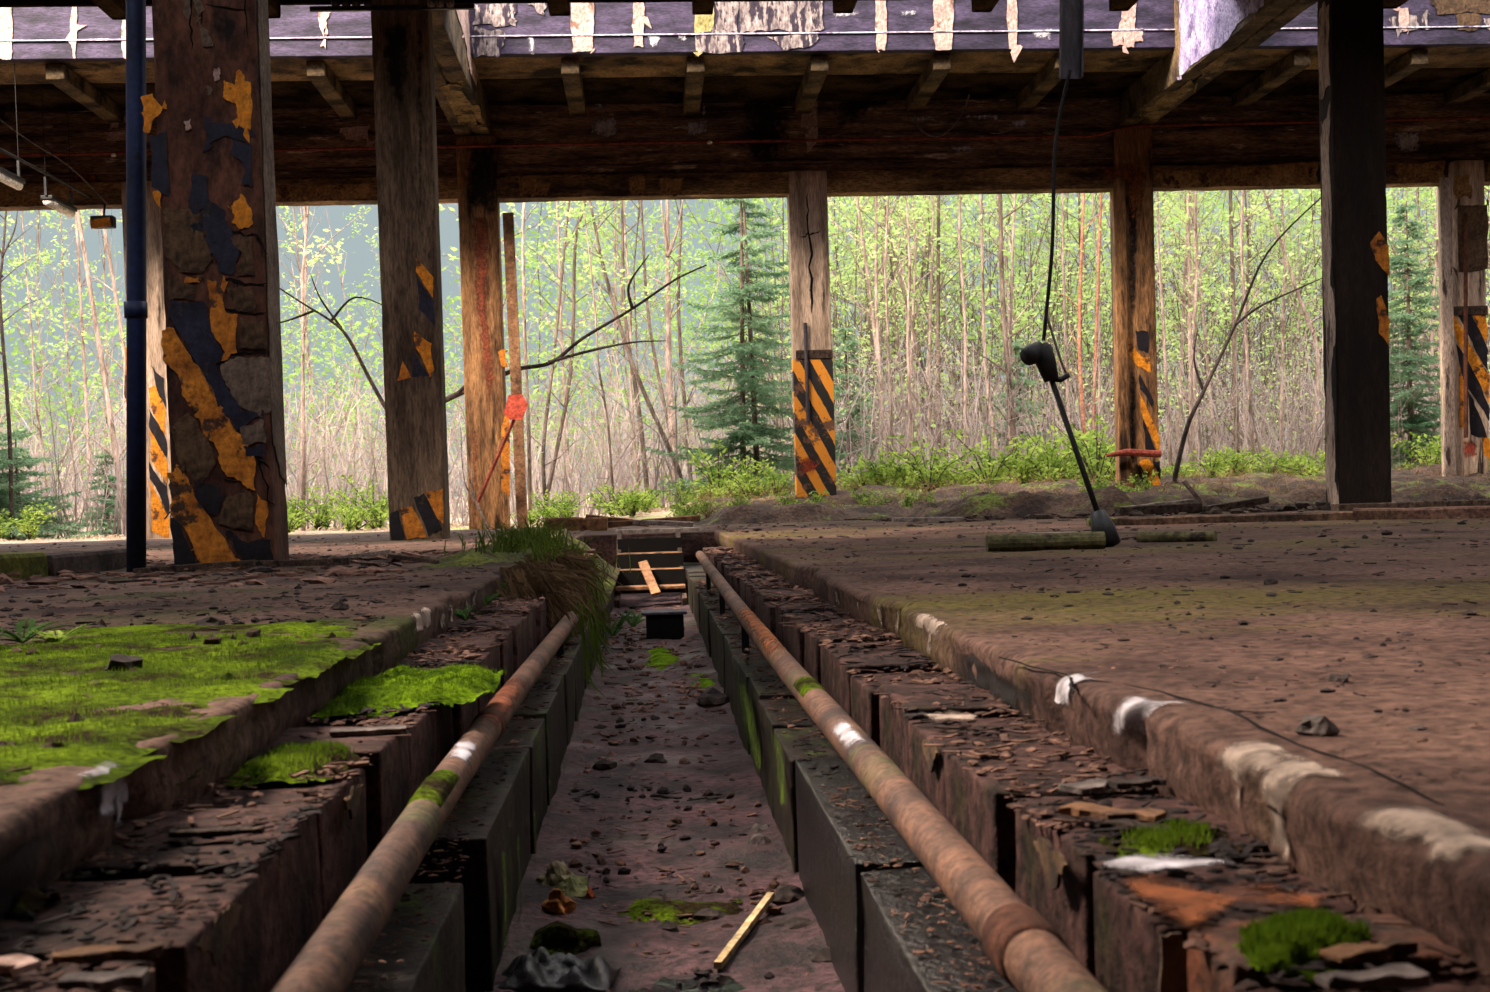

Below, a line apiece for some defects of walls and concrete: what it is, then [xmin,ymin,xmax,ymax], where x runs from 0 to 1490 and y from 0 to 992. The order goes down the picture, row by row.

peeling [0,8,13,60]
crack [189,0,249,48]
peeling [570,3,595,54]
peeling [632,3,652,47]
peeling [693,1,824,56]
peeling [875,1,887,53]
peeling [930,0,954,50]
peeling [1007,0,1023,62]
crack [802,193,820,313]
peeling [161,0,375,571]
corrosion [739,607,785,653]
corrosion [471,678,524,724]